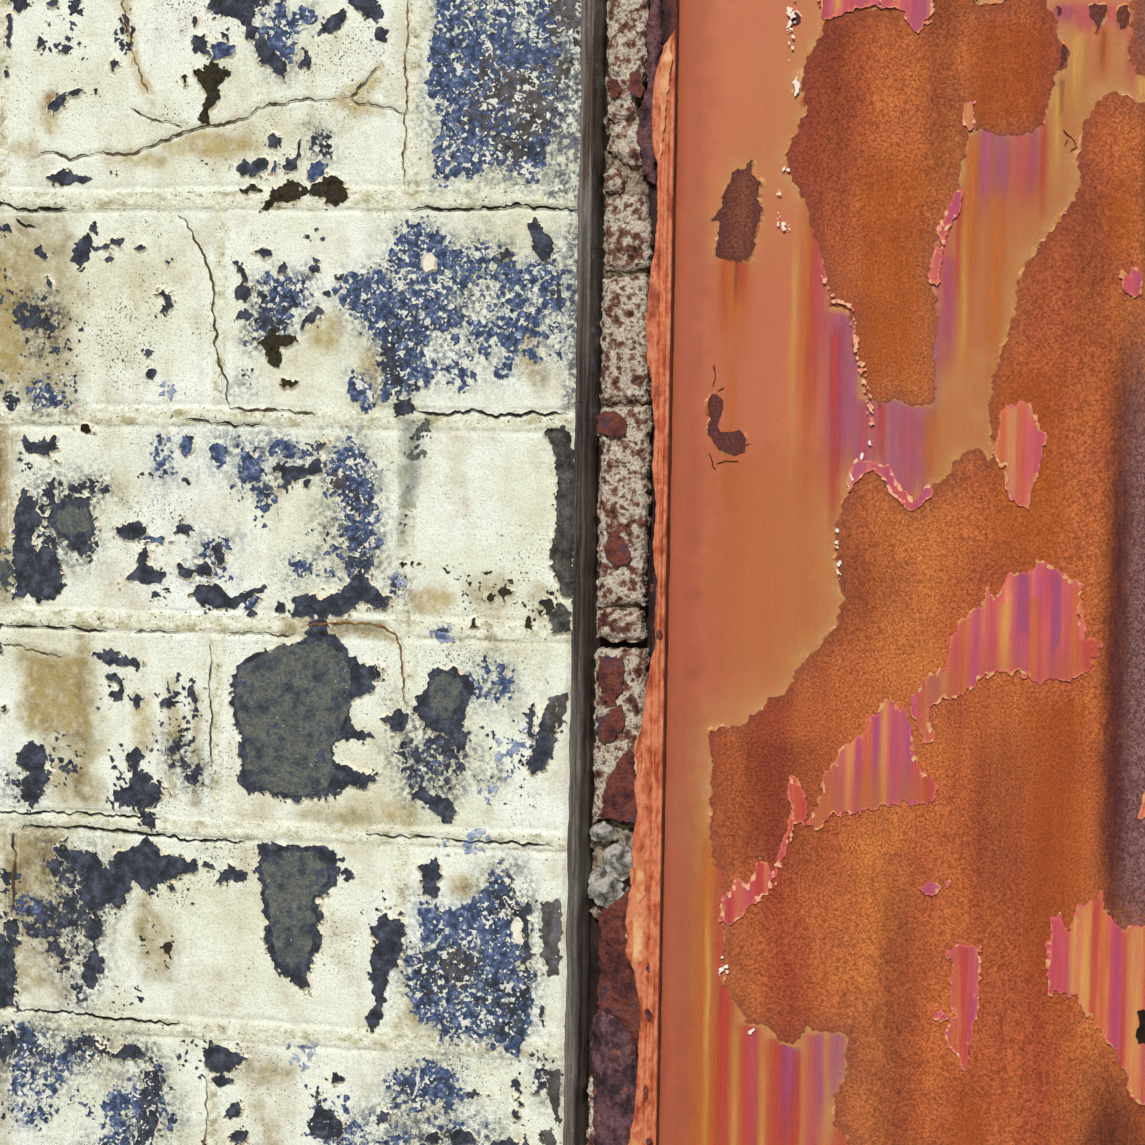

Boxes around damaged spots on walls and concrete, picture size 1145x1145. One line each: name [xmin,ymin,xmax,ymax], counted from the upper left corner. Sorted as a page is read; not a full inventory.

crack [30,0,409,180]
crack [177,214,315,427]
peeling [175,0,389,128]
peeling [231,214,576,461]
crack [409,202,577,211]
peeling [422,0,581,188]
corrosion [831,315,855,491]
peeling [782,0,1070,426]
peeling [704,91,1145,1145]
corrosion [1108,379,1145,927]
peeling [0,425,574,1145]
corrosion [697,820,813,1145]